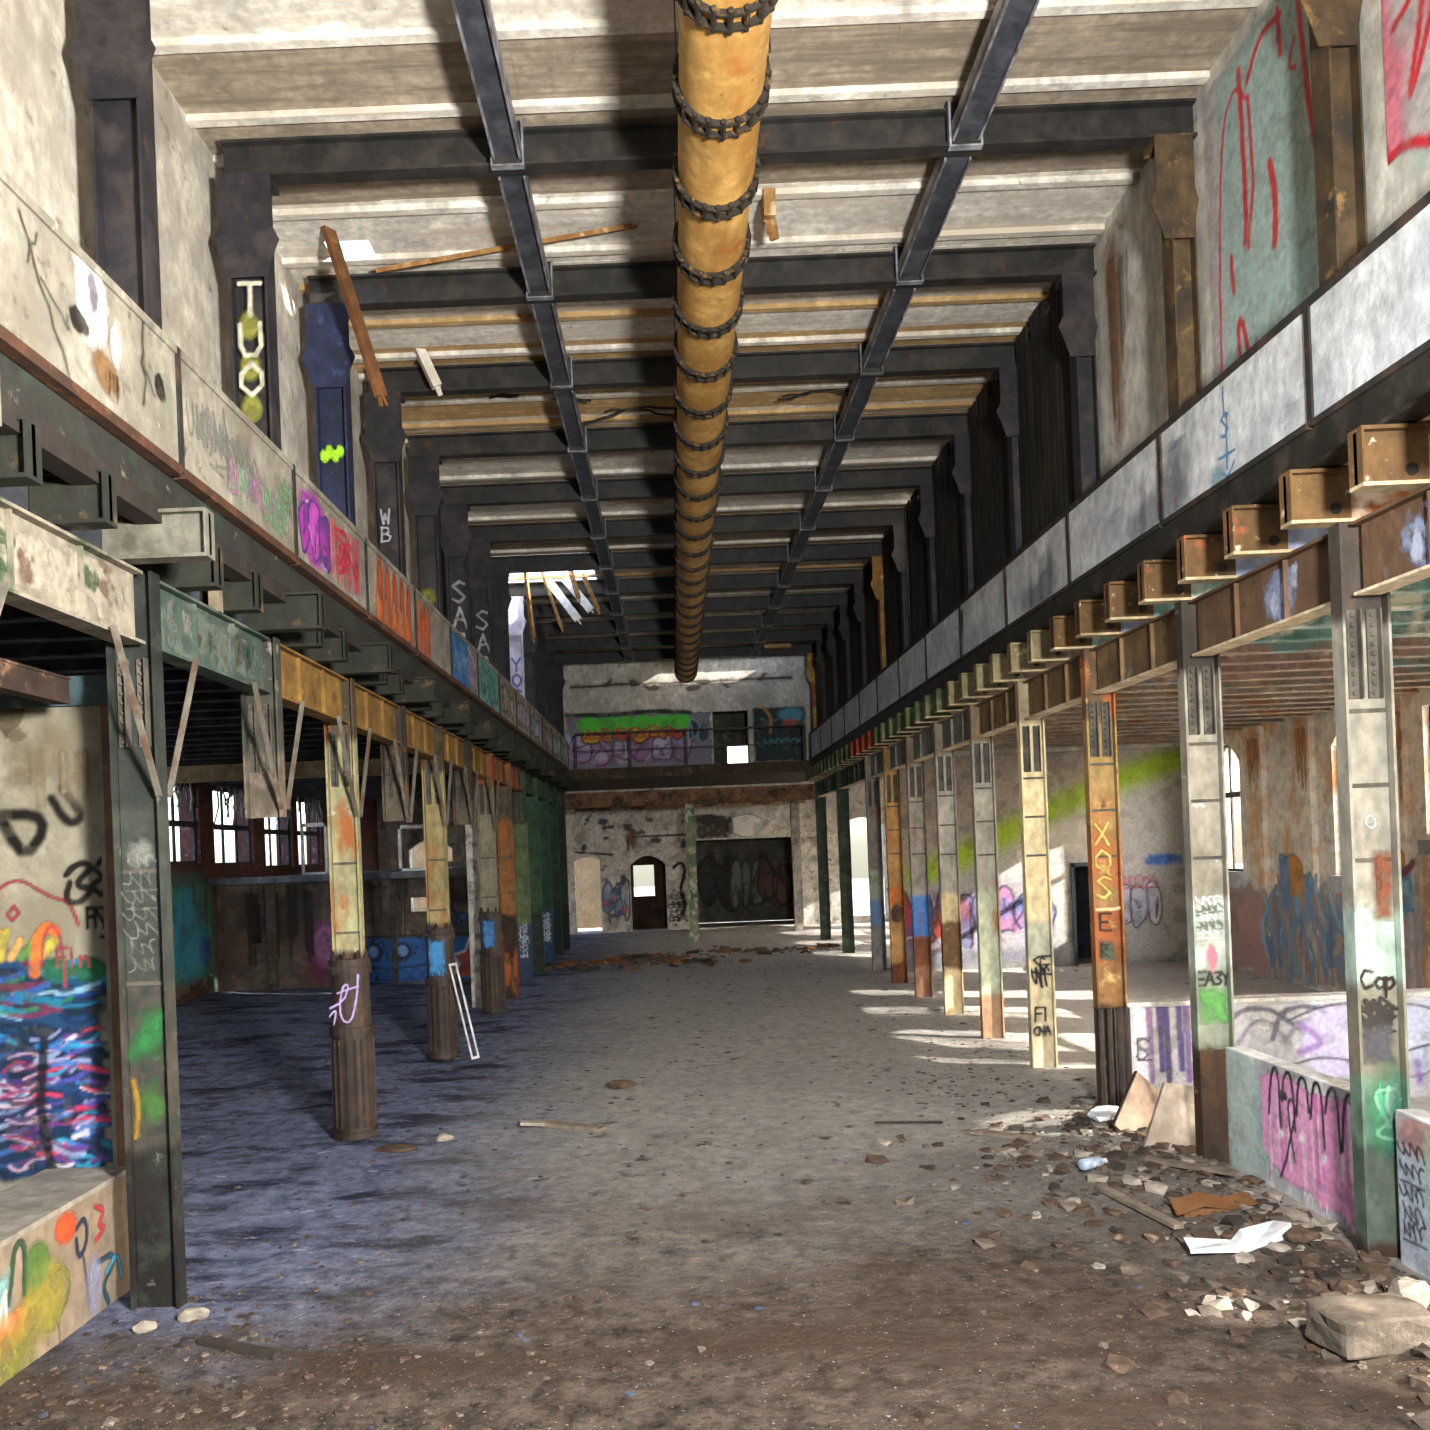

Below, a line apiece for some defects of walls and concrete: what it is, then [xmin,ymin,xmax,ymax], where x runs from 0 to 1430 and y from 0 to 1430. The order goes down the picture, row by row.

peeling [1402,500,1429,566]
peeling [1264,564,1297,620]